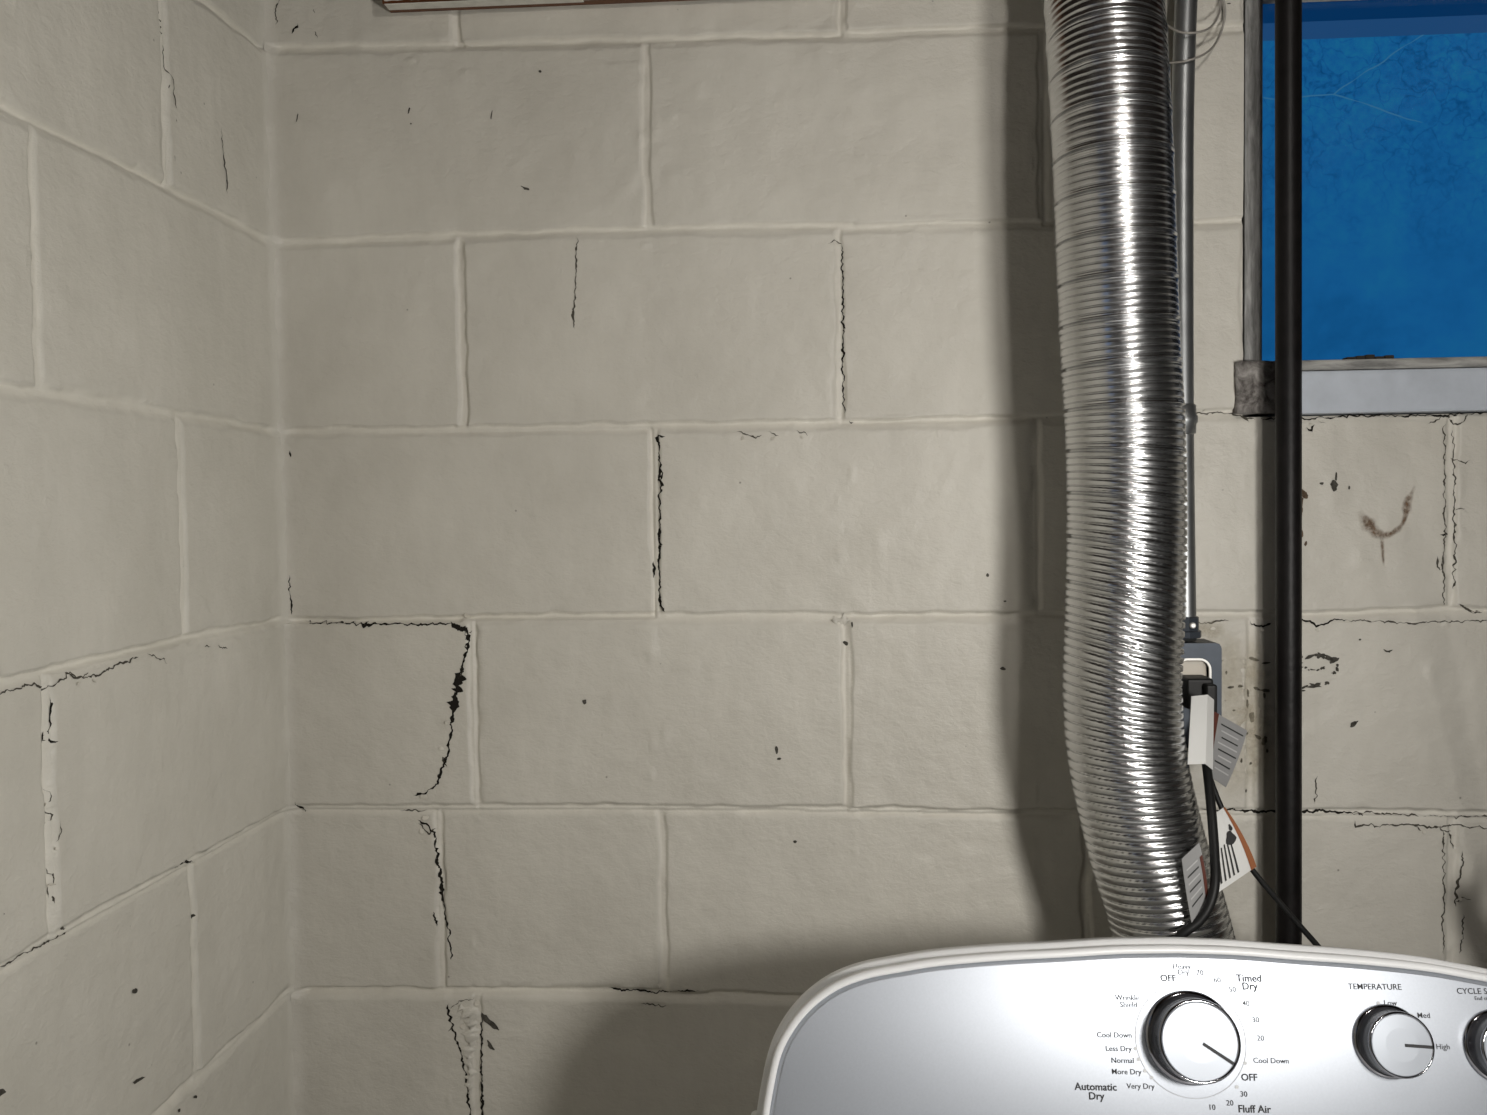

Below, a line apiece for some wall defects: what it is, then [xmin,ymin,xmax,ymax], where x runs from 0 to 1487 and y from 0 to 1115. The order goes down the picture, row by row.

crack [570,242,578,327]
crack [831,240,853,424]
crack [652,435,665,611]
crack [1197,410,1487,631]
crack [288,575,472,959]
crack [1204,808,1487,954]
crack [446,999,484,1115]